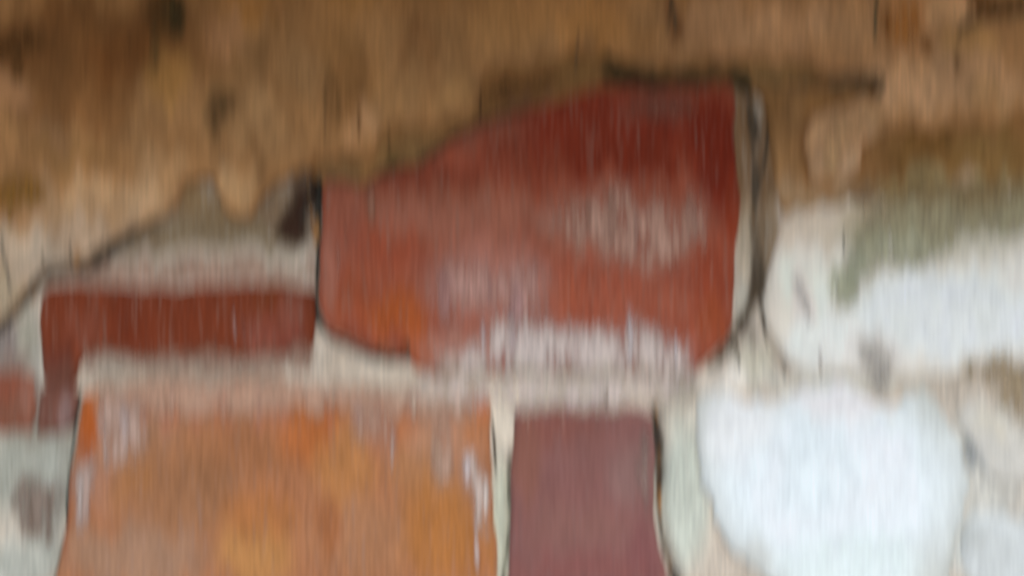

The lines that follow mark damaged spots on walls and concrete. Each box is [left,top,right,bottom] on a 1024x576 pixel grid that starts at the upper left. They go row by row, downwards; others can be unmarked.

spalling [275,178,318,247]